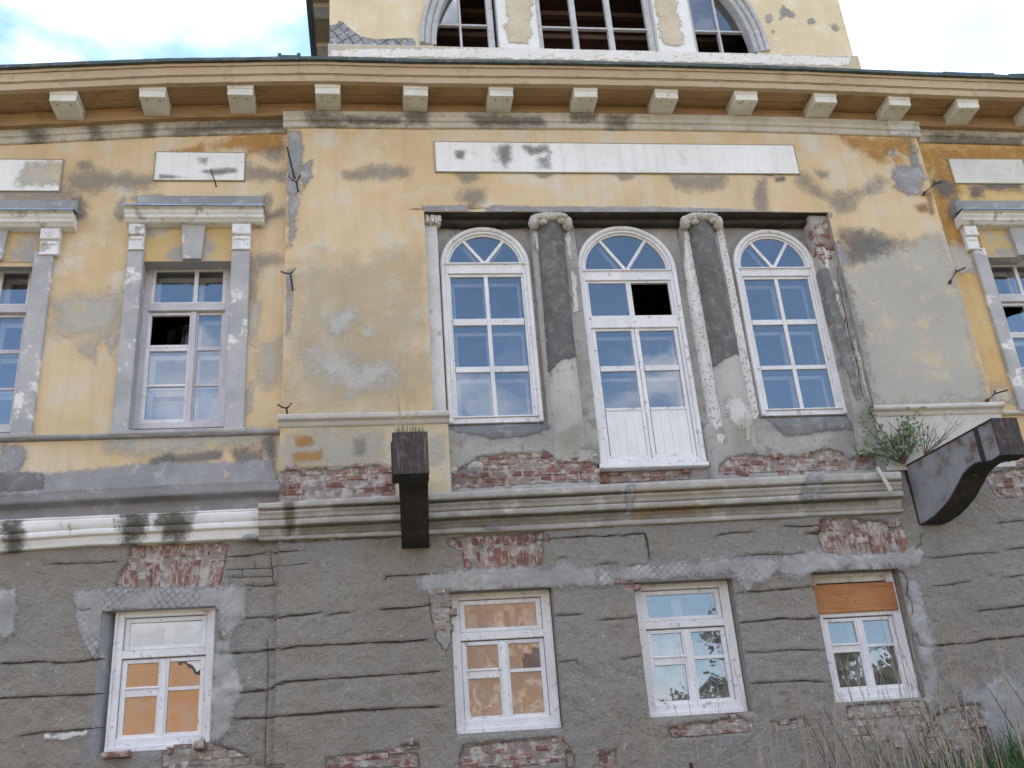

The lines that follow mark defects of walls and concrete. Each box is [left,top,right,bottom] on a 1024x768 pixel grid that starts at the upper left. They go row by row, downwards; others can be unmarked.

damp [840,230,897,263]
flaking render [808,120,1024,405]
spalling [683,229,876,476]
spalling [450,451,691,490]
damp [0,519,25,553]
damp [120,512,194,546]
spalling [813,517,906,557]
spalling [116,542,228,589]
crack [228,550,308,587]
crack [380,603,429,611]
crack [902,571,1024,646]
crack [221,612,440,767]